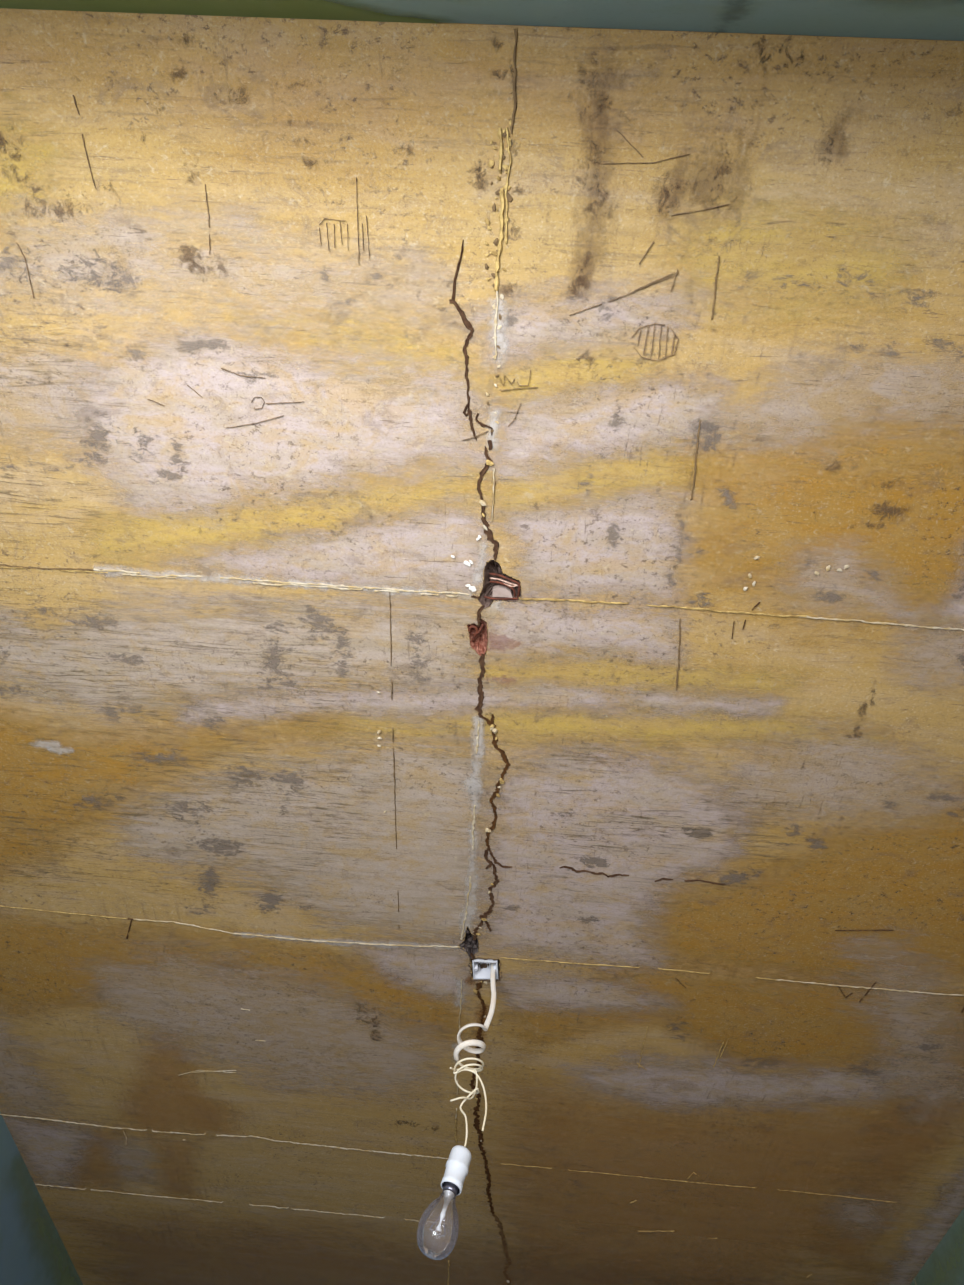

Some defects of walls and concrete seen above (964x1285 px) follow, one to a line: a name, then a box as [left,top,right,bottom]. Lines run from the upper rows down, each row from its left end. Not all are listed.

crack [449,240,499,560]
crack [469,595,512,1285]
crack [559,866,725,885]
leakage [115,1048,964,1285]